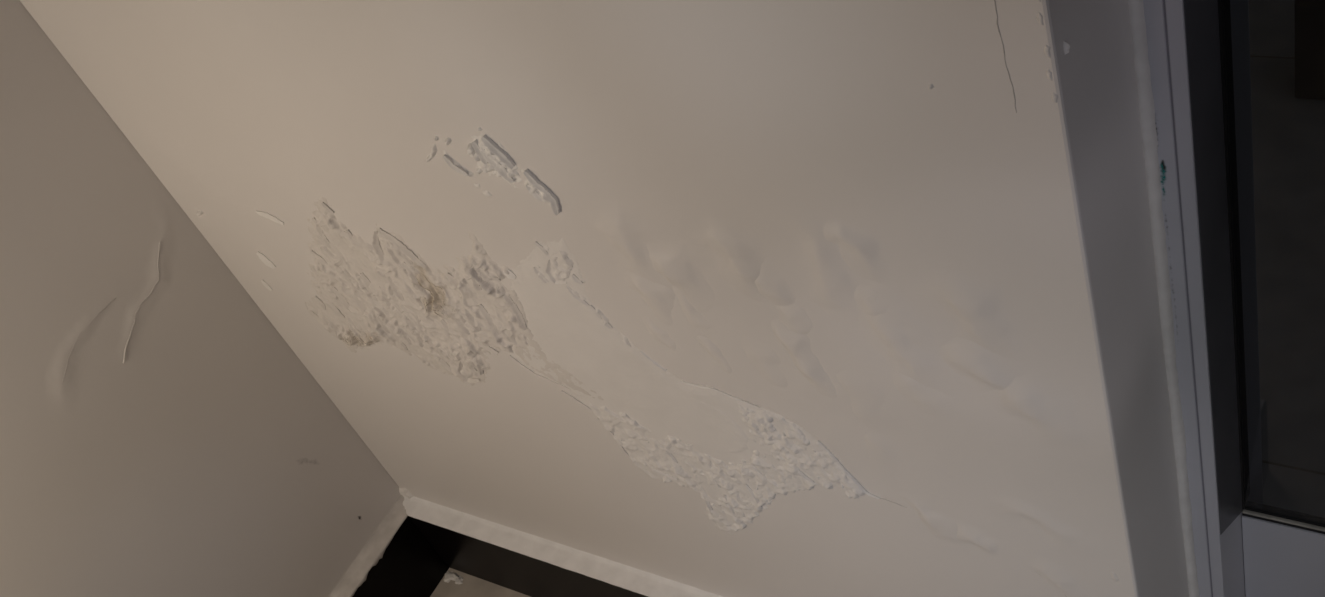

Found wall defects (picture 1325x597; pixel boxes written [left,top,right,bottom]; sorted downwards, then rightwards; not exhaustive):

peeling [426,127,561,215]
peeling [305,197,528,386]